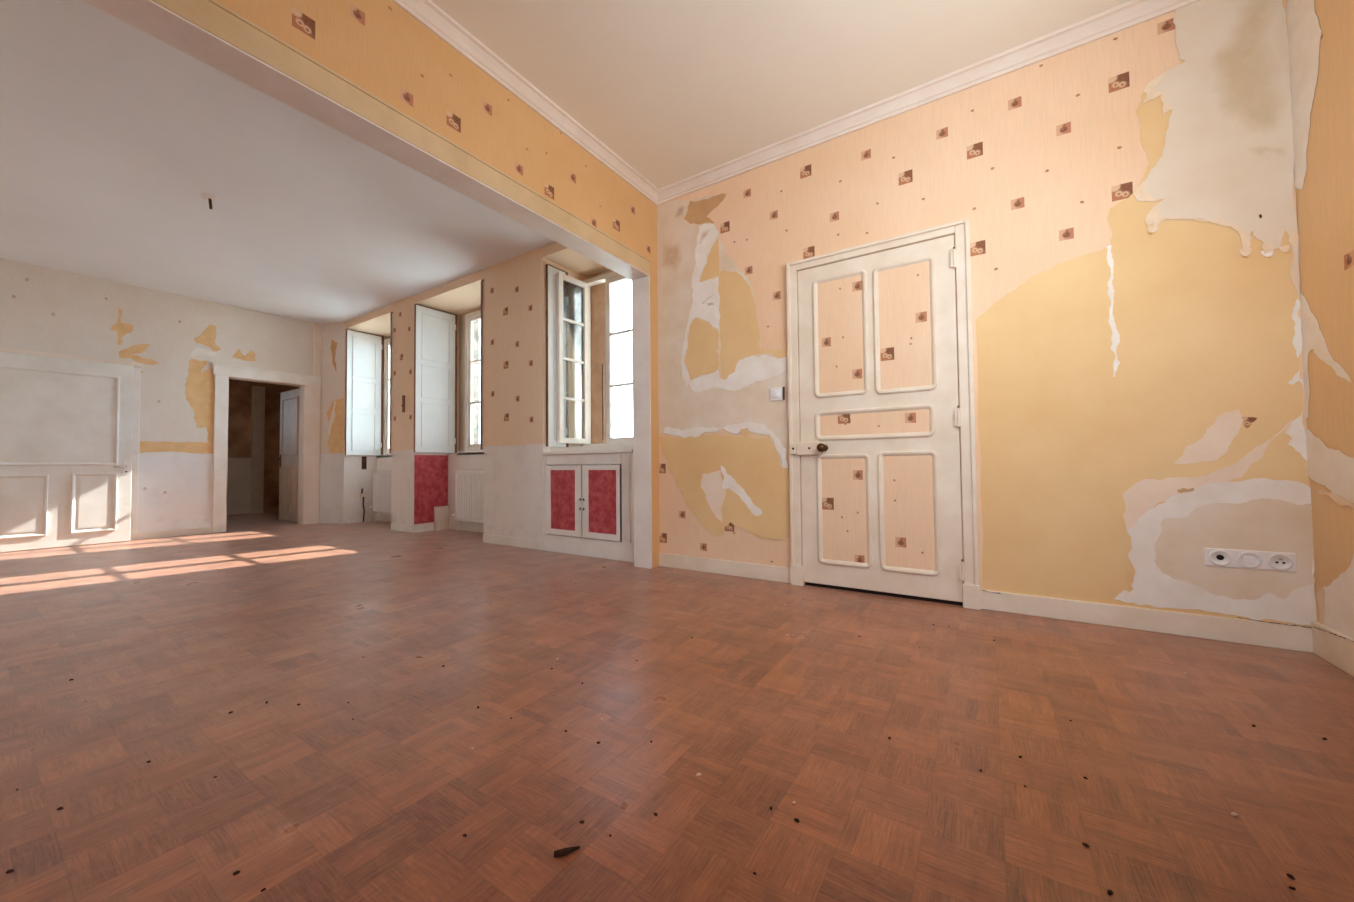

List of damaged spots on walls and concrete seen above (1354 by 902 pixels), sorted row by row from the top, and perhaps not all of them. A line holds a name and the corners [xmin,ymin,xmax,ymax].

flaking render [1133,0,1300,298]
leakage [1204,0,1292,161]
peeling [119,344,159,373]
peeling [194,324,221,351]
flaking render [657,195,789,466]
flaking render [1114,429,1354,639]